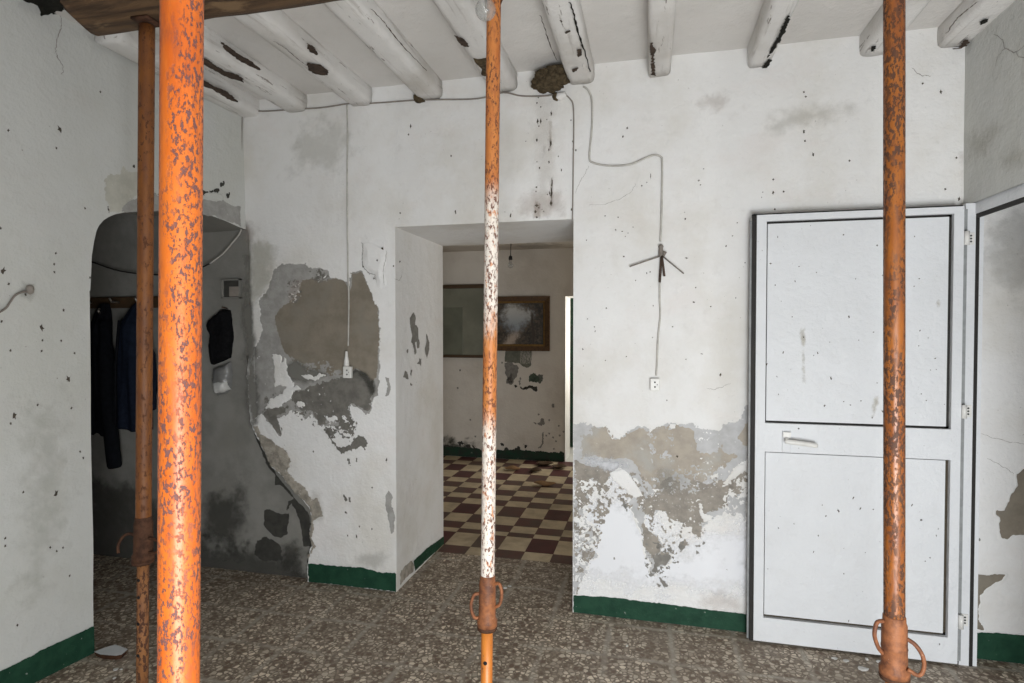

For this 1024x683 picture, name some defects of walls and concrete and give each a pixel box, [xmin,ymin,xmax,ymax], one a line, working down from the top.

peeling [204,80,238,102]
peeling [307,43,329,75]
peeling [403,313,429,386]
peeling [501,351,543,392]
peeling [246,261,391,581]
damp [92,481,135,559]
damp [201,496,302,578]
peeling [534,403,748,594]
peeling [993,467,1024,542]
peeling [977,572,1008,633]